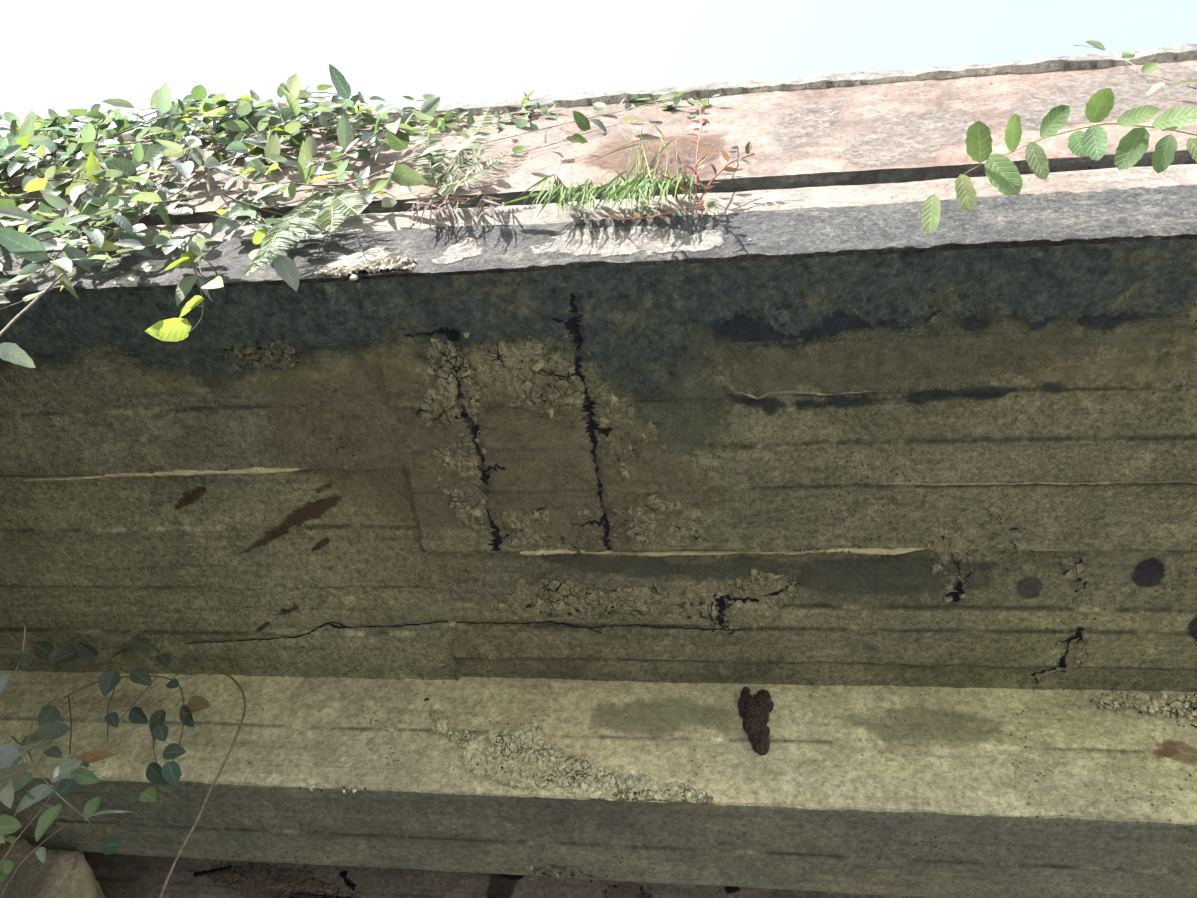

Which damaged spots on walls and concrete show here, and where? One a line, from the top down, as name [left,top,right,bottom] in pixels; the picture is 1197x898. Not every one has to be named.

damp [712,306,1151,349]
damp [724,335,1197,415]
crack [406,327,506,551]
crack [540,294,618,550]
damp [219,335,992,594]
rust [240,473,344,554]
damp [1132,558,1165,588]
crack [187,590,784,644]
crack [1031,627,1084,690]
damp [1188,615,1197,642]
damp [487,874,524,898]